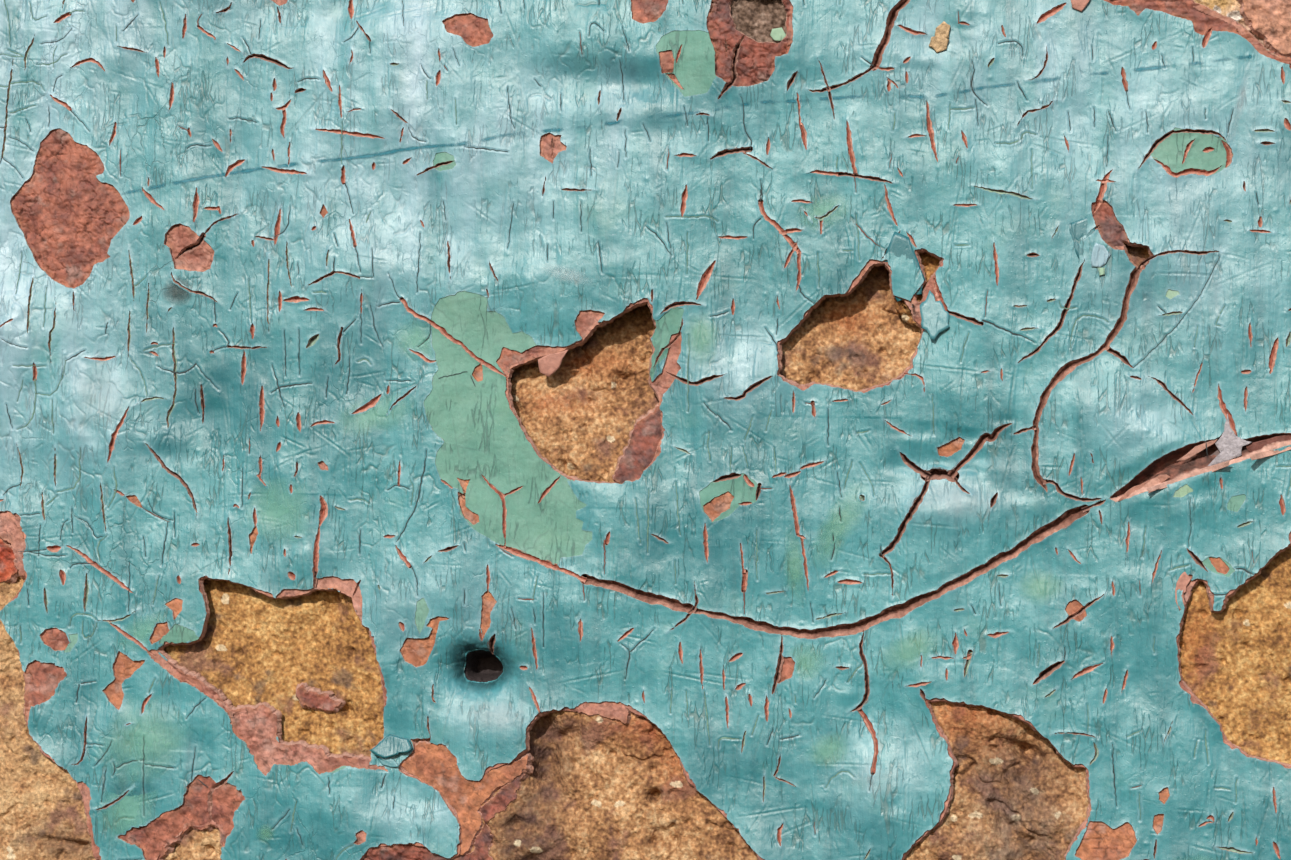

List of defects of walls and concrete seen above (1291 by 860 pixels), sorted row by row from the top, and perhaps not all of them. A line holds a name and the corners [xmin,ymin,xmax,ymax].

peeling [11,129,130,288]
crack [547,201,602,271]
crack [580,2,629,100]
crack [590,0,910,304]
spalling [778,231,949,392]
crack [927,41,1233,215]
peeling [424,291,684,565]
crack [442,243,1237,791]
spalling [104,576,765,860]
spalling [902,693,1137,860]
crack [1055,705,1142,817]
spalling [1175,533,1291,768]